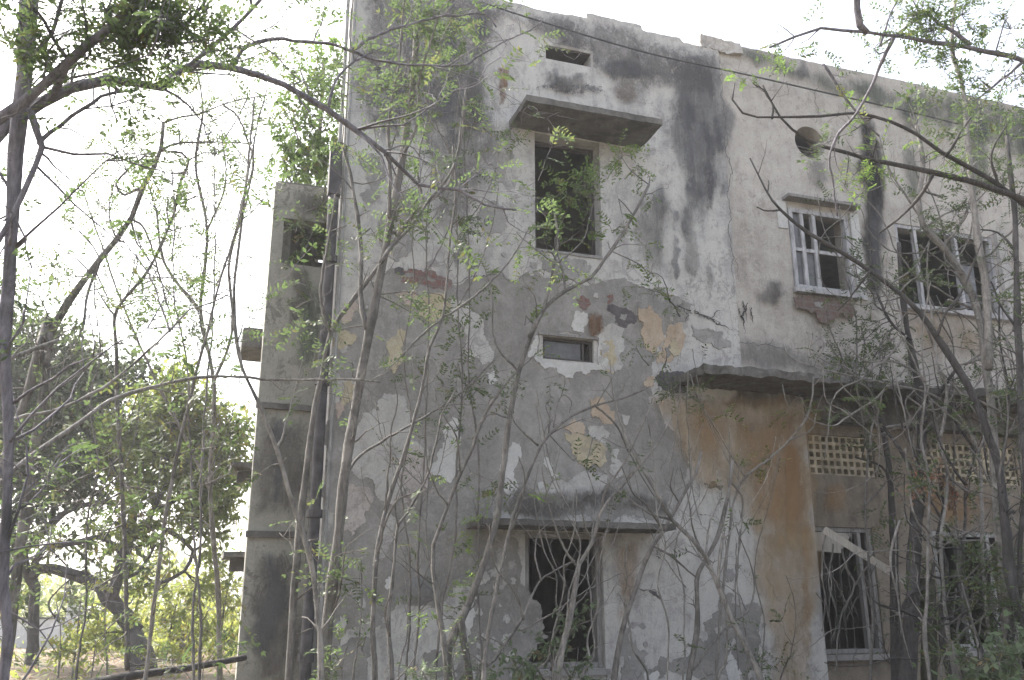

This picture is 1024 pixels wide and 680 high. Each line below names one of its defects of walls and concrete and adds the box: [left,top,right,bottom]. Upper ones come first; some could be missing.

damp [529,16,735,279]
crack [677,62,799,353]
damp [858,117,886,301]
peeling [317,189,731,680]
damp [515,490,666,516]